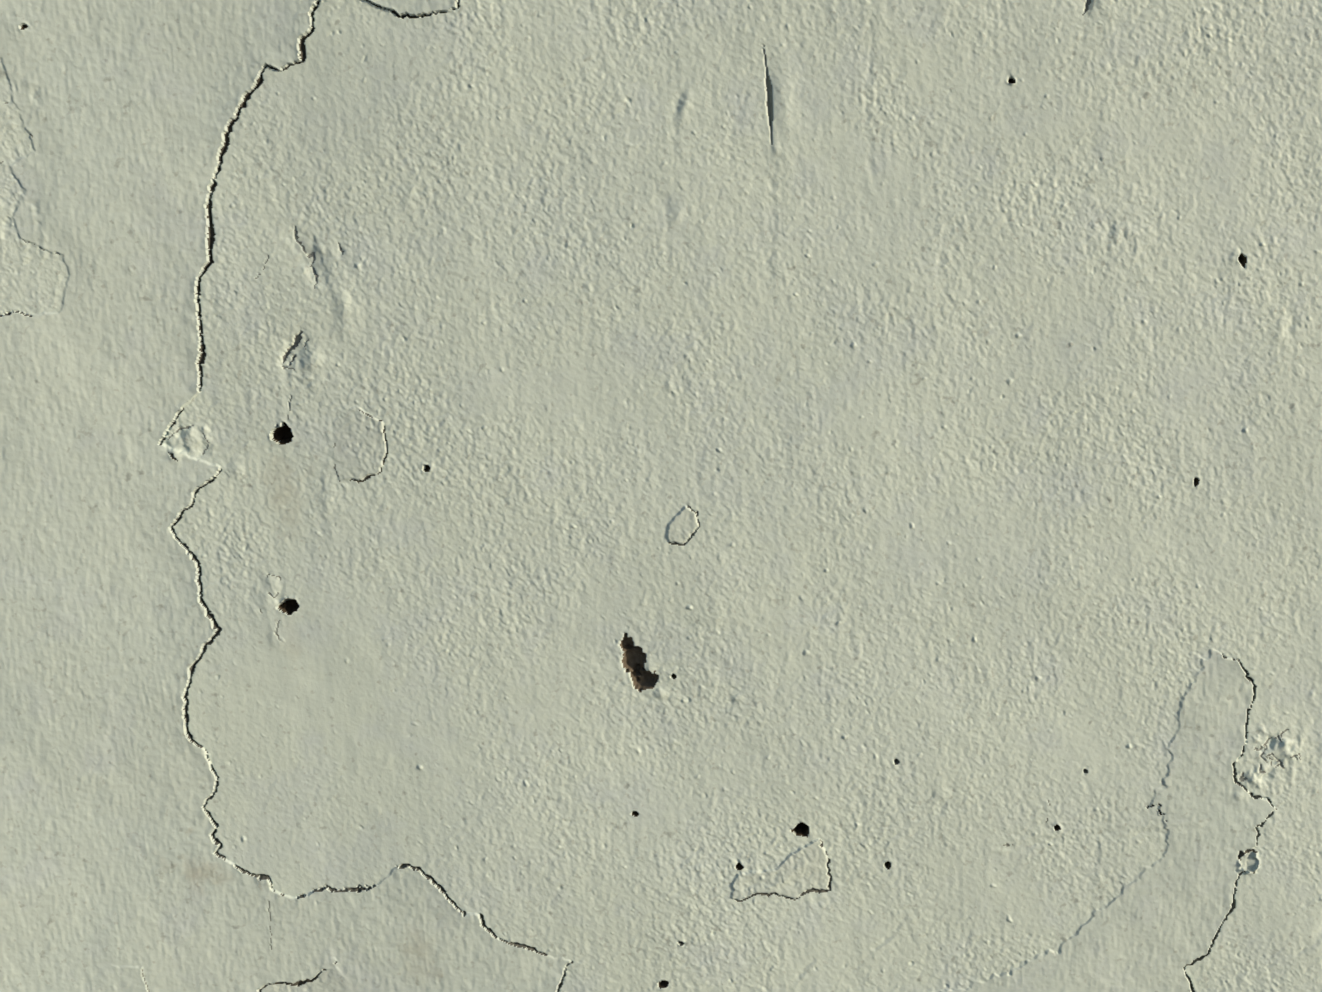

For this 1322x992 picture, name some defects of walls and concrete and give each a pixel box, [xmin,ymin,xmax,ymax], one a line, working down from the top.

spalling [764,49,773,145]
peeling [214,117,239,175]
peeling [195,180,217,298]
crack [255,226,344,289]
peeling [195,318,206,389]
spalling [279,332,311,370]
peeling [333,406,388,483]
peeling [188,551,222,678]
crack [260,574,281,641]
spalling [620,633,659,693]
spalling [1229,709,1303,805]
peeling [731,839,832,902]